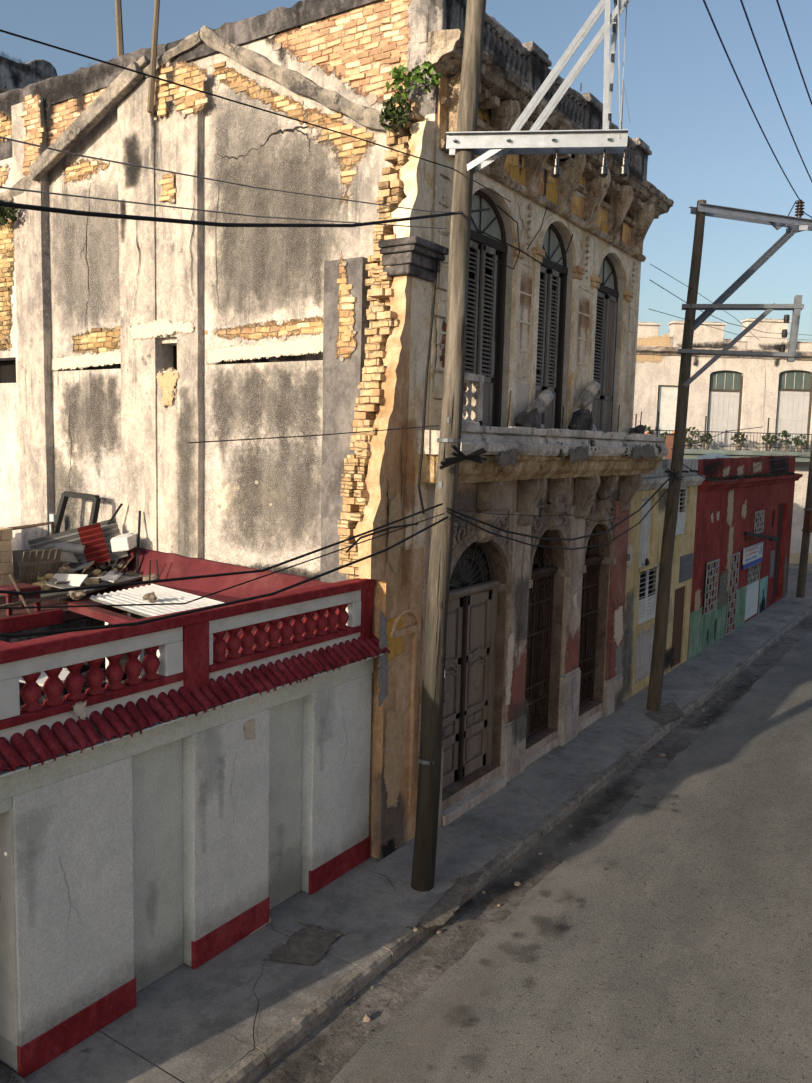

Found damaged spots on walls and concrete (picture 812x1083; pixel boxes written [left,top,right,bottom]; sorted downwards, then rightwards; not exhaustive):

spalling [0,216,15,351]
peeling [51,315,323,371]
crack [177,126,313,309]
spalling [146,0,425,579]
leakage [53,379,122,532]
leakage [175,338,320,566]
peeling [723,461,762,477]
peeling [711,489,747,611]
peeling [377,609,407,808]
peeling [505,631,515,706]
leakage [615,593,654,710]